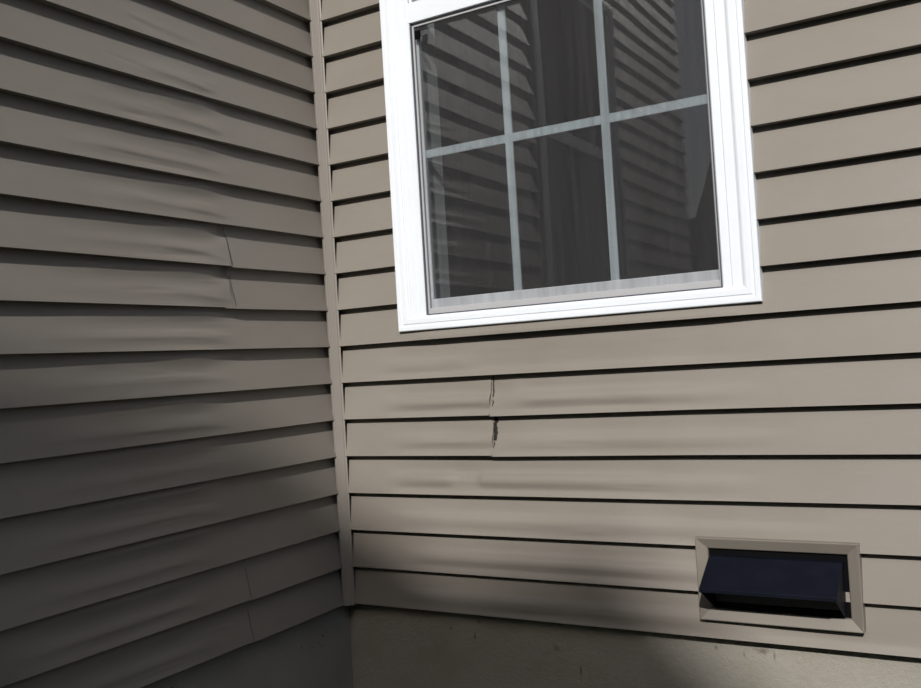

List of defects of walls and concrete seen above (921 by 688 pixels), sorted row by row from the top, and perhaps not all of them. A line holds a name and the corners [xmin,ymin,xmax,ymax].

crack [491,376,499,448]